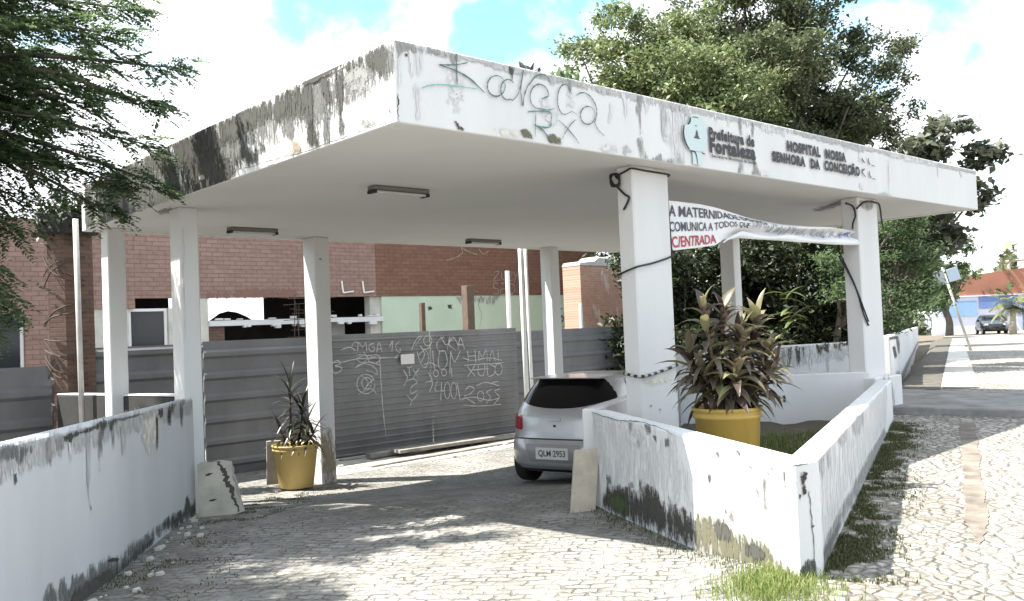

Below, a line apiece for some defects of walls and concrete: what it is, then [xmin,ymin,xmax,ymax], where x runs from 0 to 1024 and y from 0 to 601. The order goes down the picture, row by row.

leakage [84,40,976,230]
leakage [777,341,849,373]
leakage [0,396,193,490]
crack [217,461,240,512]
leakage [44,495,196,601]